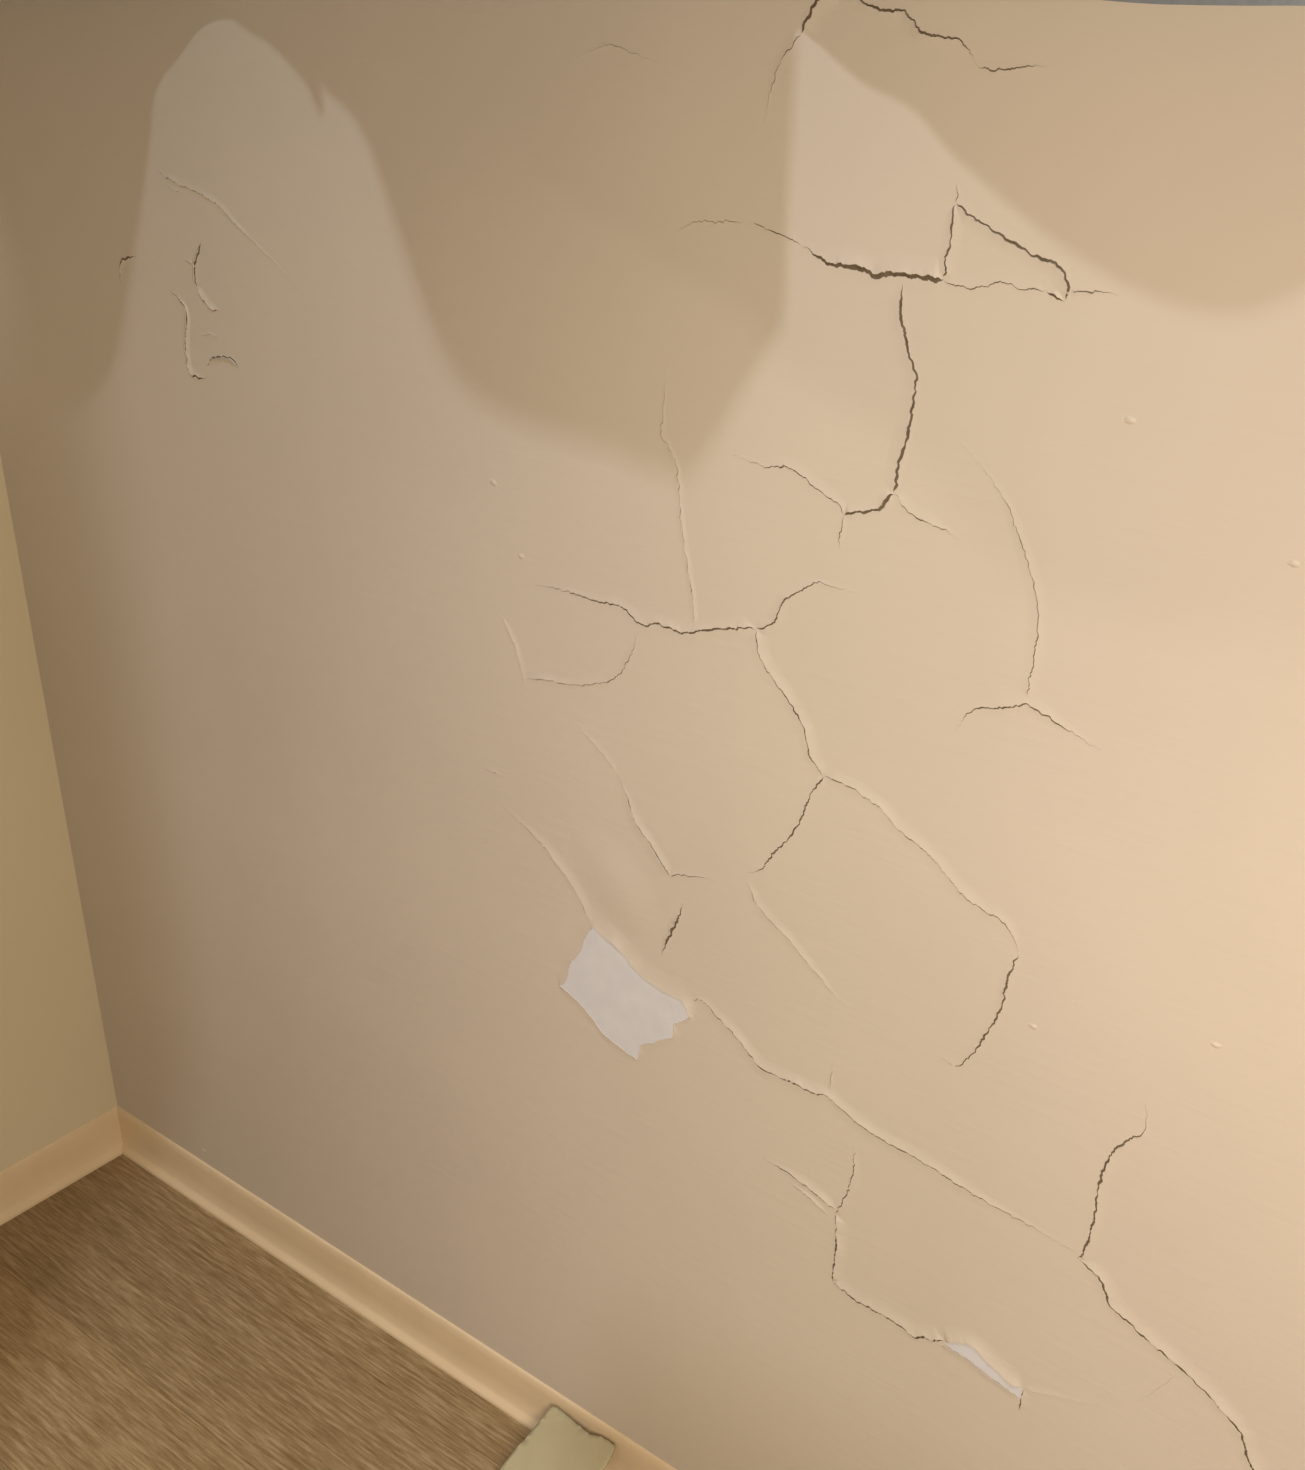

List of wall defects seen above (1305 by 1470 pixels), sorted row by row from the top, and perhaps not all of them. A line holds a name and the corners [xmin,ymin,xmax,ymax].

crack [495,283,1021,1068]
crack [954,439,1101,752]
peeling [501,802,697,1063]
peeling [762,1138,1096,1412]
crack [693,996,1270,1470]